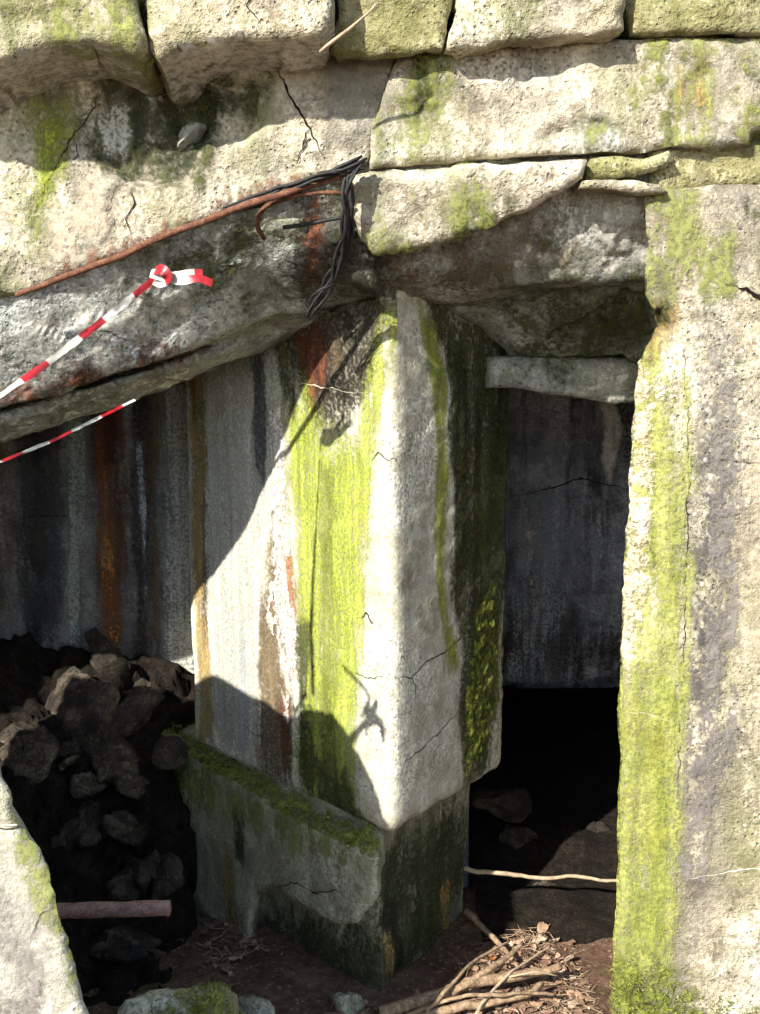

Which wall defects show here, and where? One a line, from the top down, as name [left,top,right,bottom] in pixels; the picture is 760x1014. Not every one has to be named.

crack [277,69,321,169]
crack [24,97,97,233]
corrosion [87,220,169,264]
crack [726,283,760,300]
corrosion [90,405,128,654]
water stain [0,185,649,819]
crack [506,477,629,498]
crack [356,625,481,697]
crack [278,882,355,903]